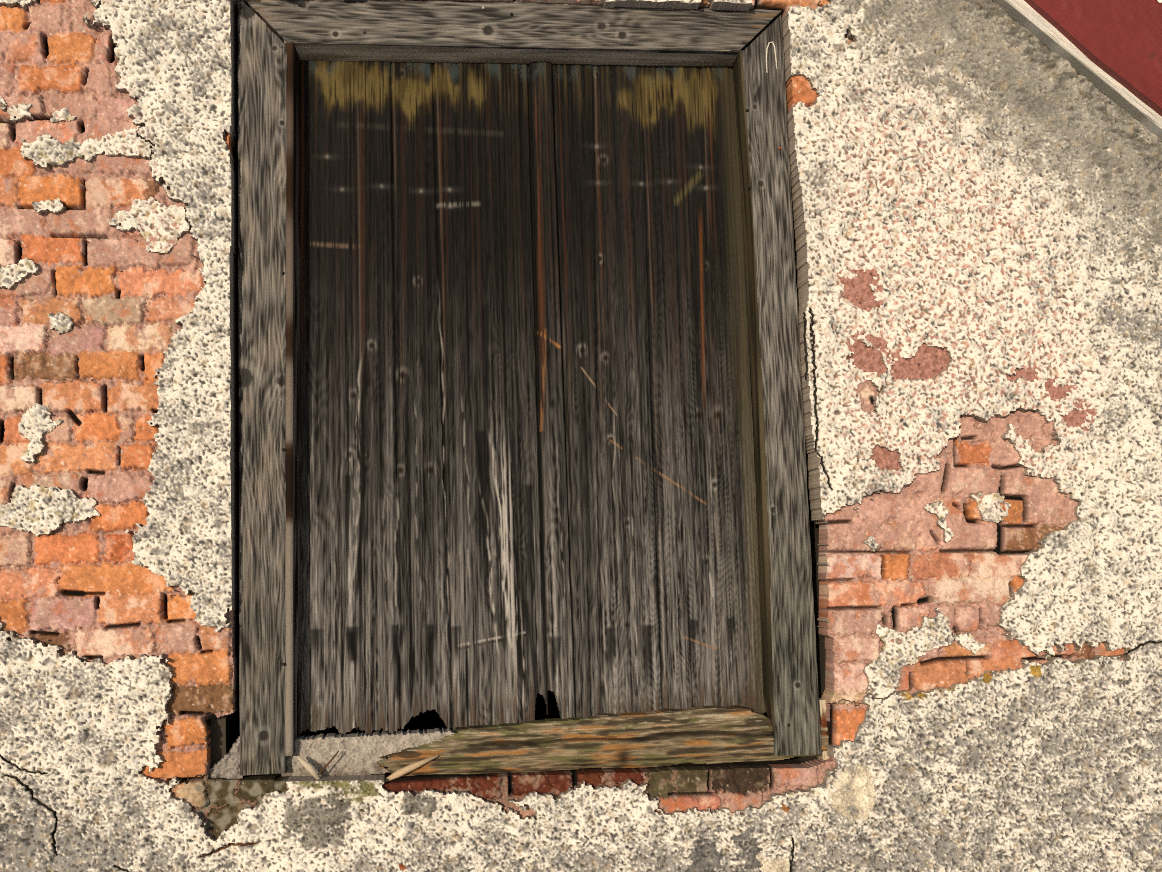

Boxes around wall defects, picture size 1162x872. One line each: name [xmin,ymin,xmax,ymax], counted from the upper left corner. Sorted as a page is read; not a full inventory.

spalling [749,0,829,18]
spalling [0,0,289,839]
spalling [382,361,1124,818]
crack [1125,641,1162,654]
crack [0,755,58,856]